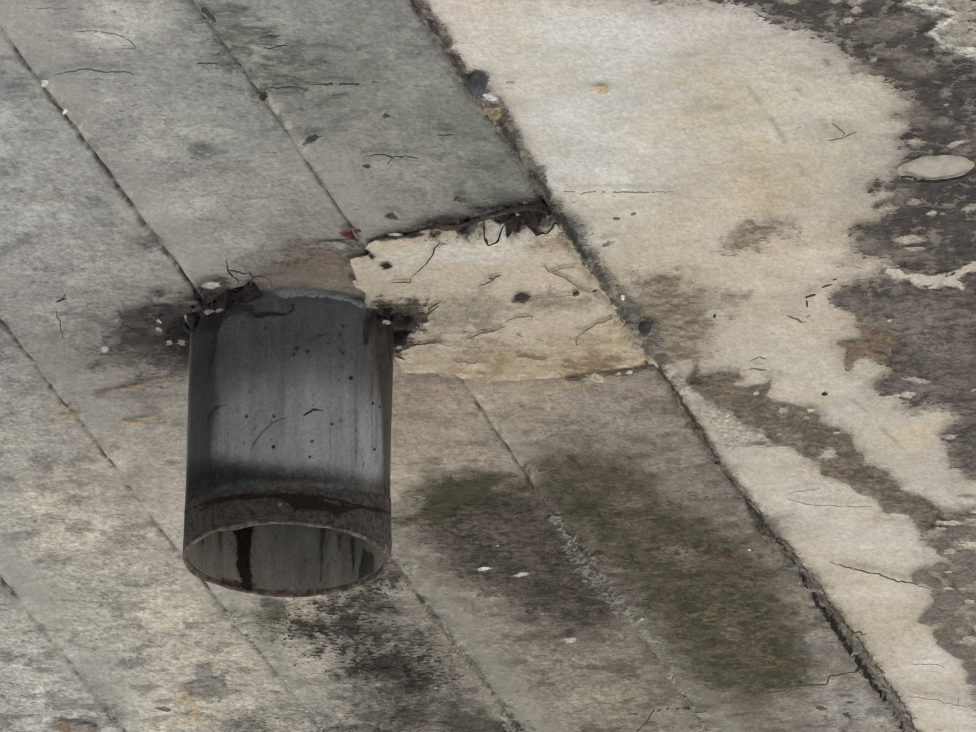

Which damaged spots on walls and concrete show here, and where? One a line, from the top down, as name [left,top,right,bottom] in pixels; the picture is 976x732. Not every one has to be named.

leakage [192,302,257,376]
leakage [363,314,394,358]
spalling [377,0,918,732]
leakage [624,268,976,695]
corrosion [183,486,392,556]
corrosion [222,578,256,591]
leakage [183,470,724,732]